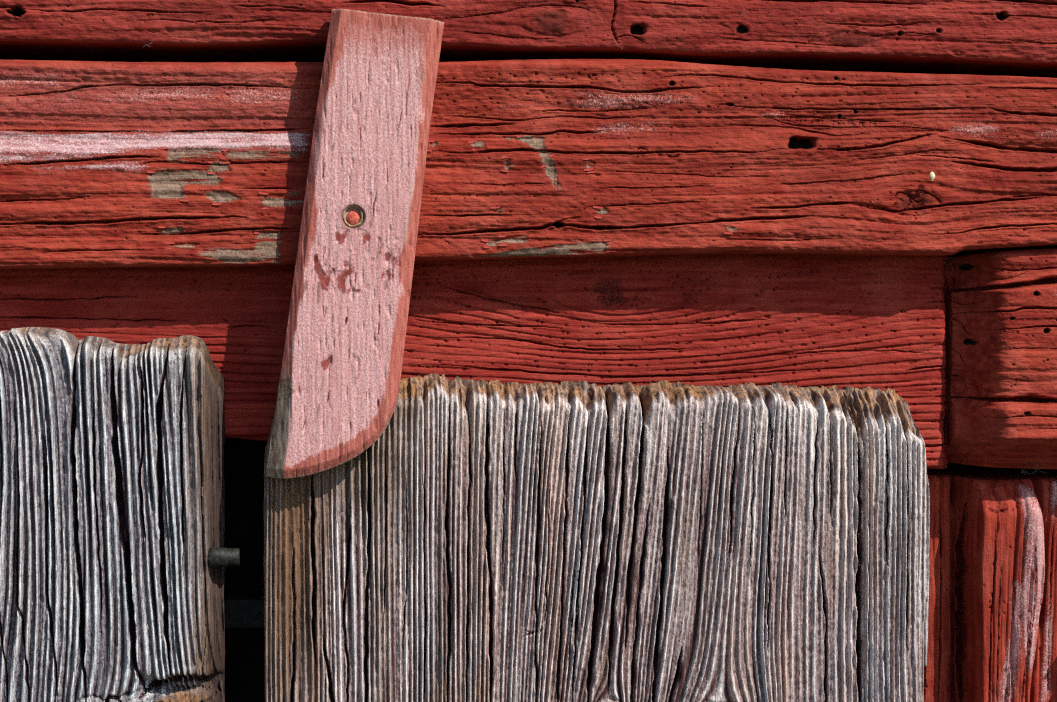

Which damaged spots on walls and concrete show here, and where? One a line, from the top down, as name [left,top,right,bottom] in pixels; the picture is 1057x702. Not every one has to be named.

crack [0,297,222,702]
crack [291,289,825,702]
crack [812,416,832,702]
crack [855,395,946,702]
crack [924,504,1006,702]
crack [988,527,1054,702]